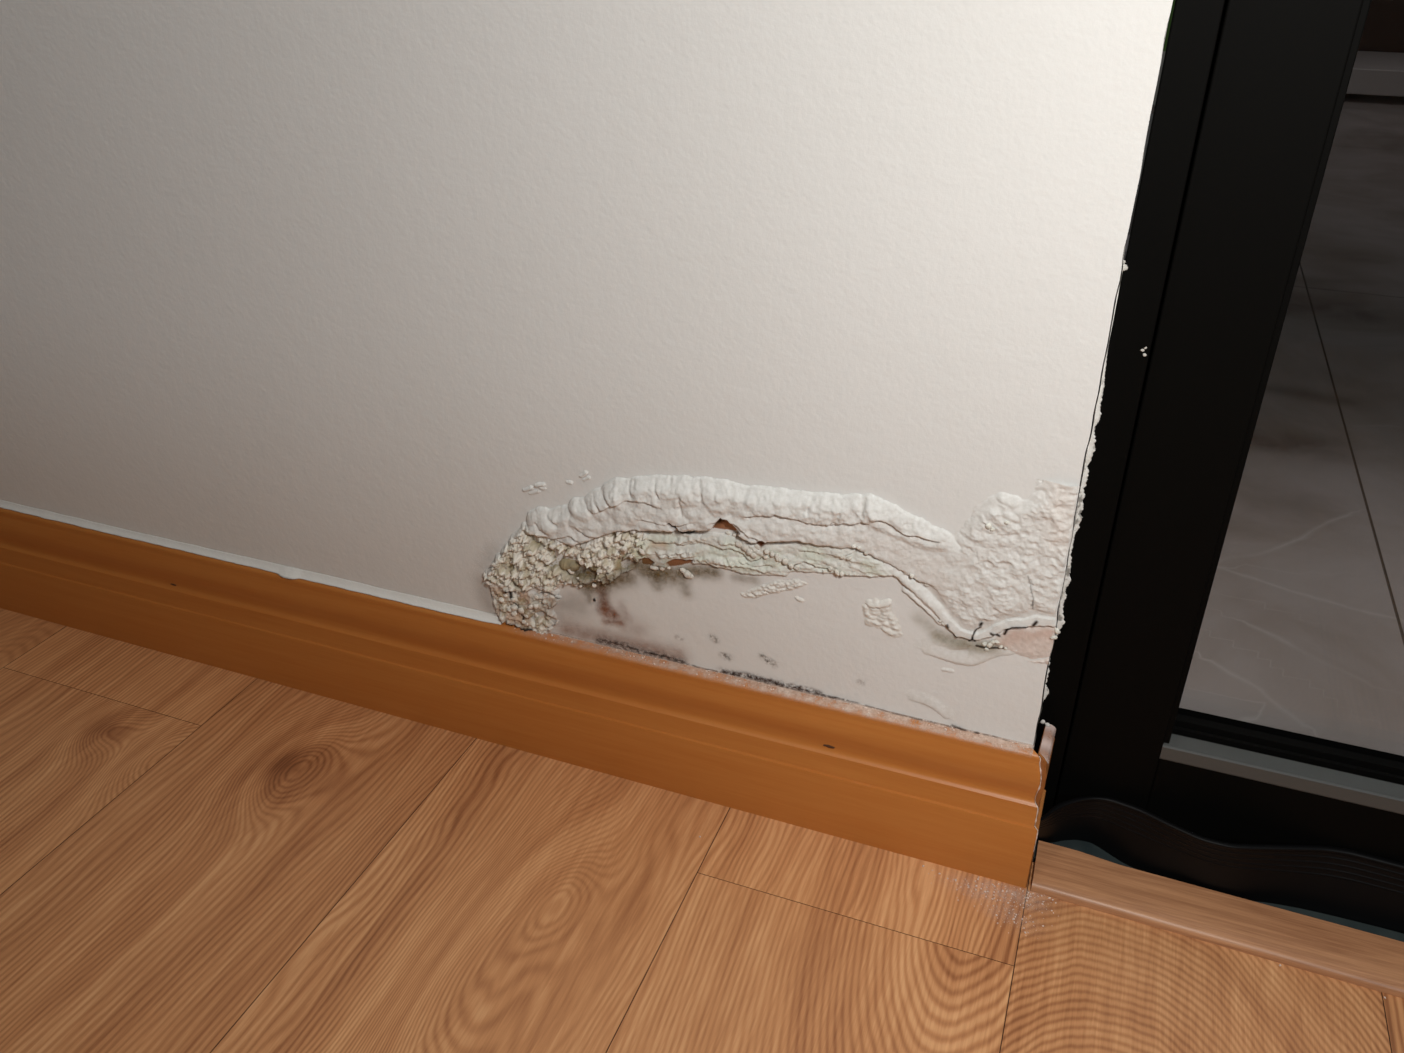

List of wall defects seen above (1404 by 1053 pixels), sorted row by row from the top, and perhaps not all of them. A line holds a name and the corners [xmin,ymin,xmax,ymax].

spalling [976,260,1128,727]
spalling [629,518,957,639]
damp [716,639,819,695]